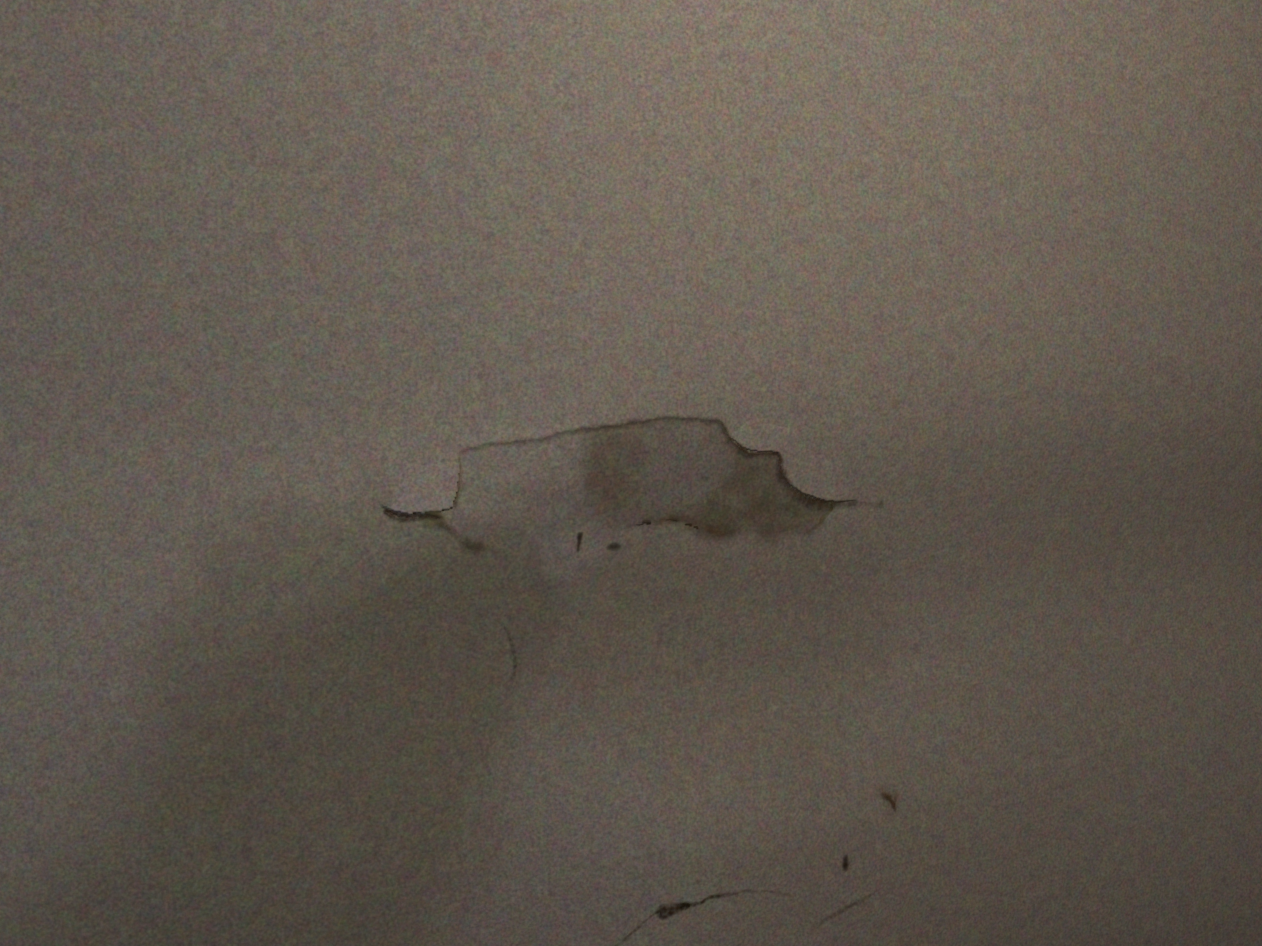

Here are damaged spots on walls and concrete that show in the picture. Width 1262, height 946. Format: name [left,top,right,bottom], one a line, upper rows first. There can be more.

peeling [382,417,855,550]
crack [657,895,721,918]